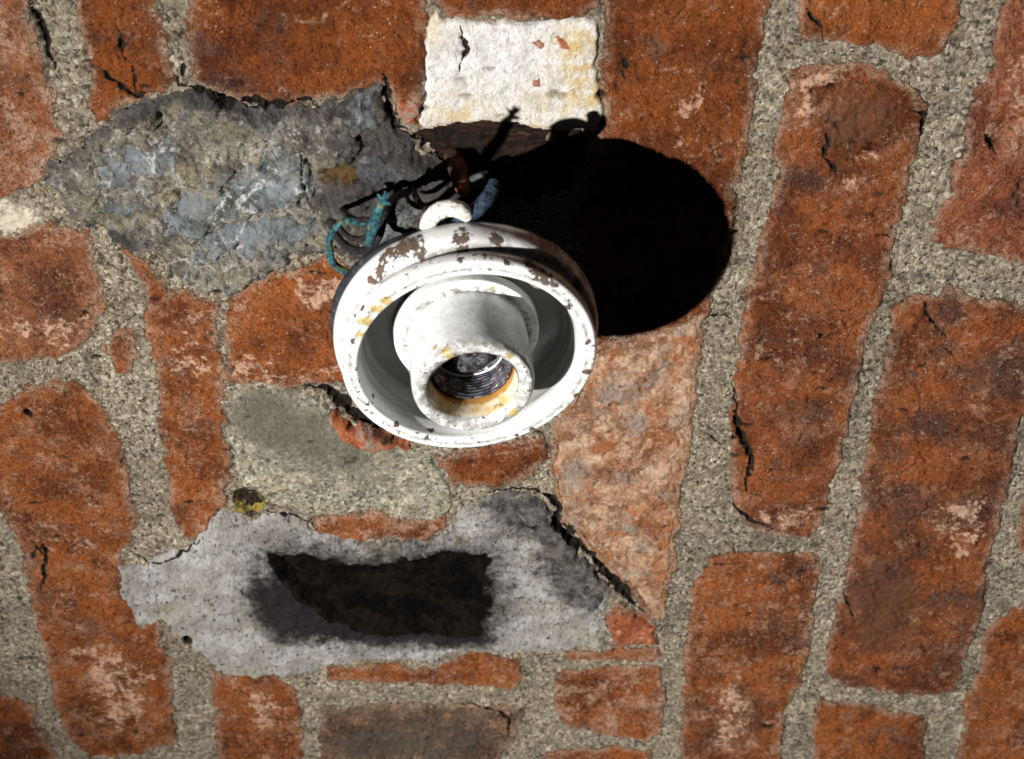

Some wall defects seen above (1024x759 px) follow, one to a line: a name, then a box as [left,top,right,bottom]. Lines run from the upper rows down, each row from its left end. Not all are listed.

crack [28,0,56,69]
crack [100,26,317,113]
spalling [44,83,483,296]
crack [289,383,382,429]
crack [706,382,773,529]
spalling [237,487,263,506]
crack [485,487,651,616]
peeling [117,565,161,629]
peeling [321,641,449,664]